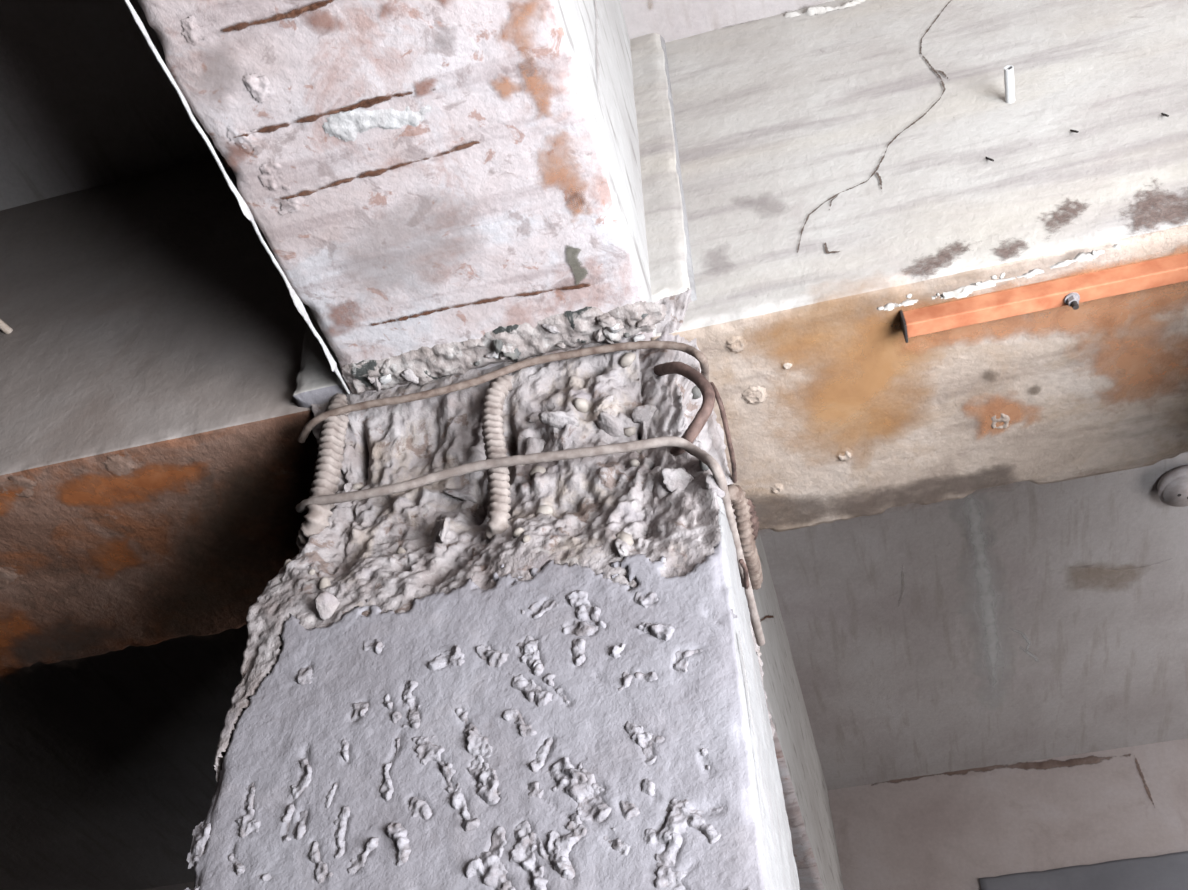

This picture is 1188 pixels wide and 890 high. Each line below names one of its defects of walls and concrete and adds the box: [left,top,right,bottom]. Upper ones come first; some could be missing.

crack [222,0,334,32]
corrosion [416,80,434,95]
corrosion [496,62,549,113]
crack [234,89,436,138]
crack [281,141,480,200]
water stain [1043,199,1087,232]
water stain [1128,180,1188,237]
water stain [906,242,968,277]
corrosion [772,281,1188,446]
spalling [124,0,776,782]
peeling [102,454,142,477]
spalling [235,782,261,838]